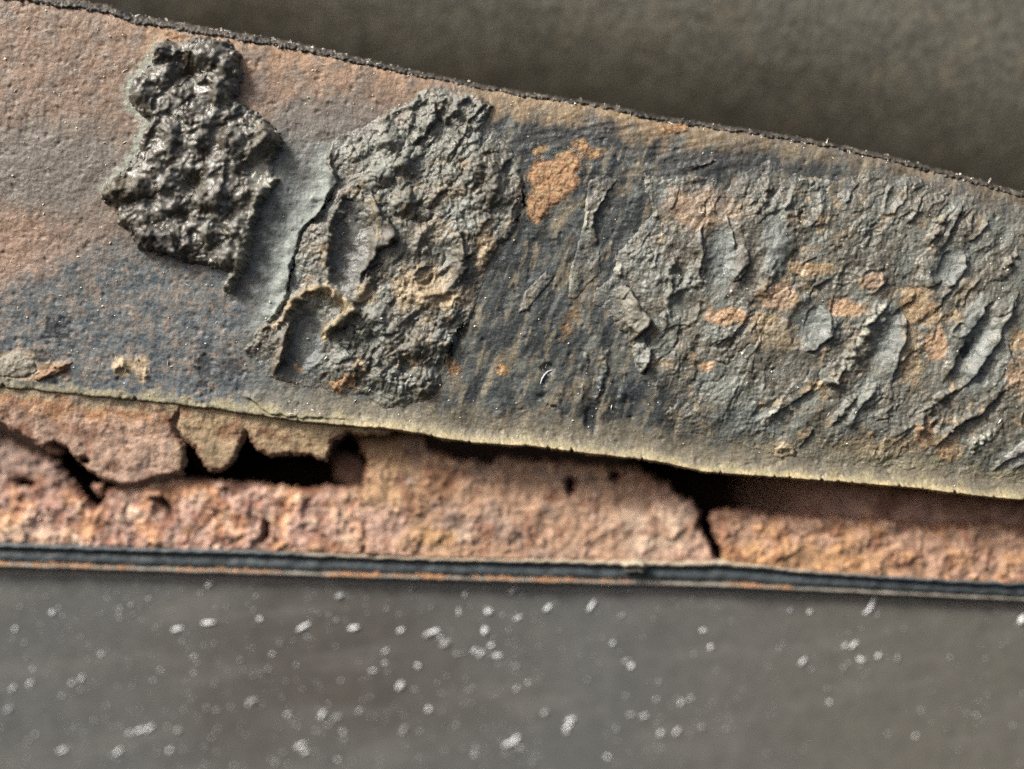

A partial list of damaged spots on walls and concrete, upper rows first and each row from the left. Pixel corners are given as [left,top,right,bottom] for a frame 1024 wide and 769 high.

corrosion [525,139,606,225]
peeling [568,160,1024,481]
corrosion [0,385,1024,584]